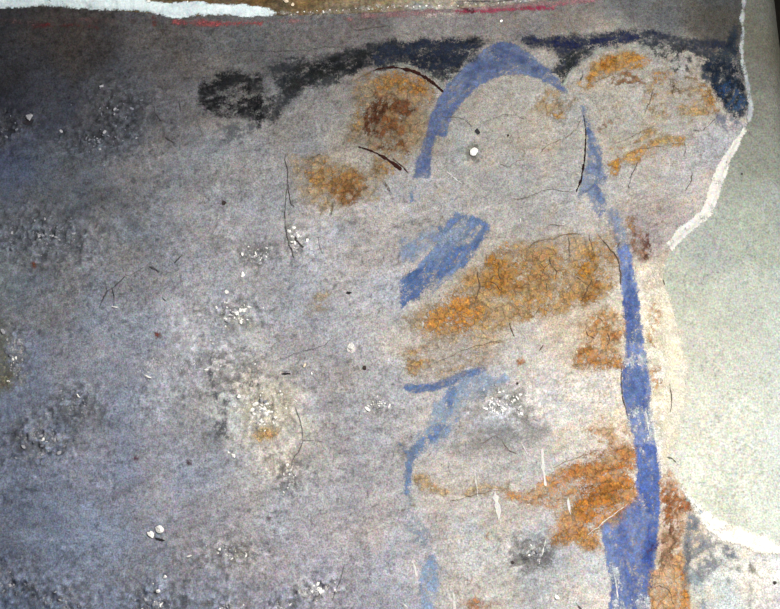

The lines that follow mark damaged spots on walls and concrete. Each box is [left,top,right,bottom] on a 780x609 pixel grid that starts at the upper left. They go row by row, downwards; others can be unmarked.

spalling [0,0,523,19]
crack [520,117,587,199]
spalling [682,487,780,555]